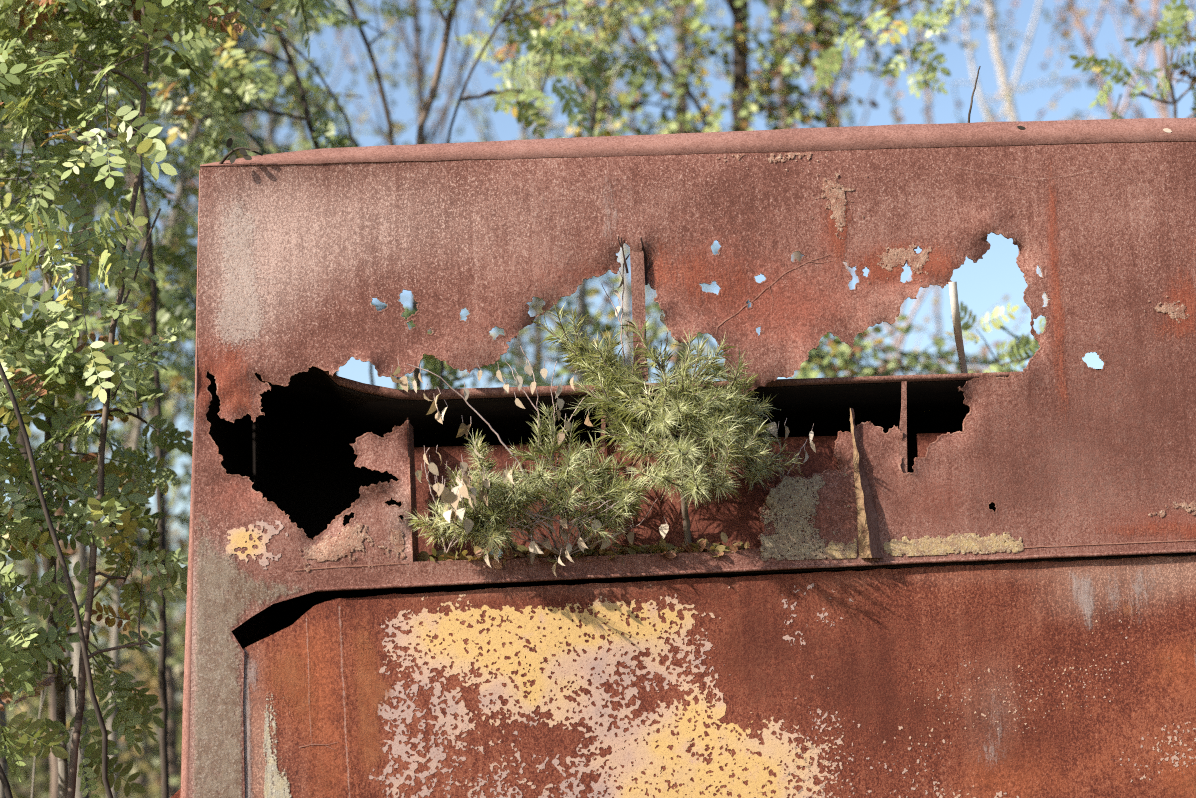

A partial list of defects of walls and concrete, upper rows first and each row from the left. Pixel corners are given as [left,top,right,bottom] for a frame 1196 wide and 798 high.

corrosion [648,242,745,305]
corrosion [829,205,847,262]
corrosion [858,238,957,285]
corrosion [1158,268,1196,338]
corrosion [199,345,251,414]
peeling [222,518,288,570]
peeling [368,583,1132,798]
peeling [1120,722,1196,782]